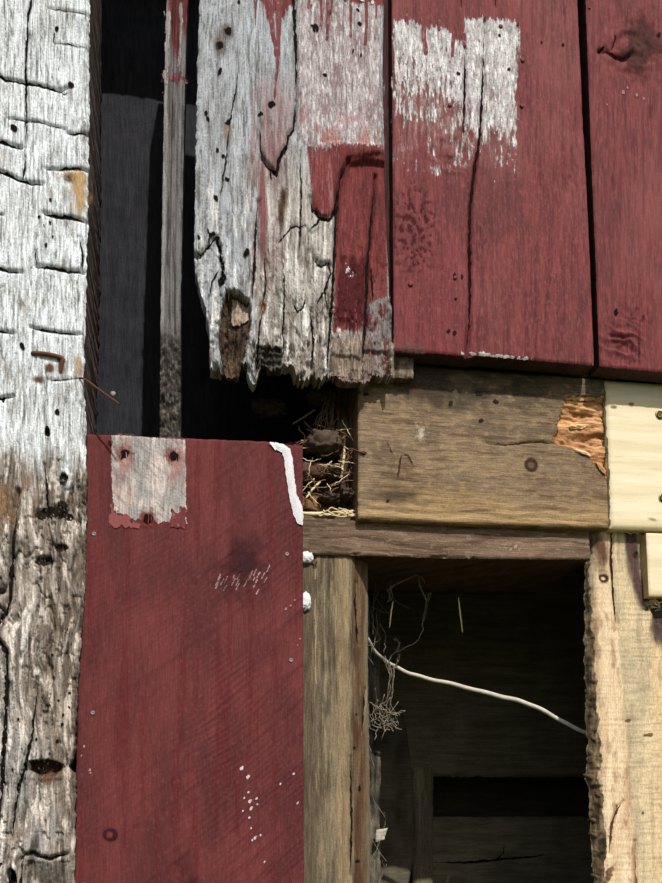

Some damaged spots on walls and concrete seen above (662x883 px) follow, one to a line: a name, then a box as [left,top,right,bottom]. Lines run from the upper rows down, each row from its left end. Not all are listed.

crack [0,0,89,185]
peeling [295,0,521,176]
crack [0,214,85,288]
rust [33,362,64,382]
rust [65,170,86,214]
peeling [231,299,250,326]
spalling [253,344,285,368]
crack [252,0,345,380]
peeling [331,256,395,380]
crack [463,38,484,359]
peeling [109,435,188,529]
crack [0,493,39,836]